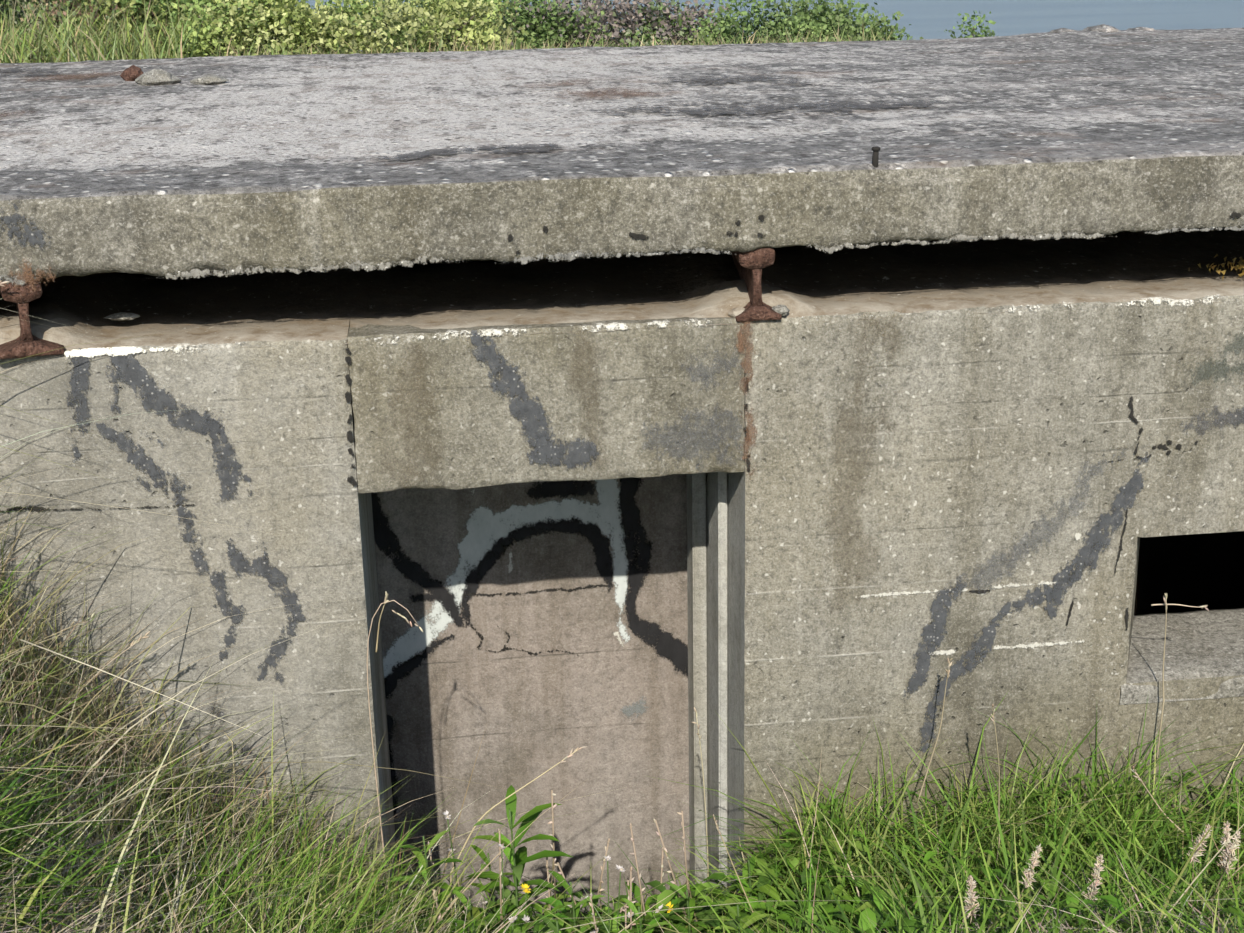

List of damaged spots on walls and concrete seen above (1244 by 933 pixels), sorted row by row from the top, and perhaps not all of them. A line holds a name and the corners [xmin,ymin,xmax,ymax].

corrosion [736,321,757,459]
crack [1109,396,1151,462]
crack [463,584,608,655]